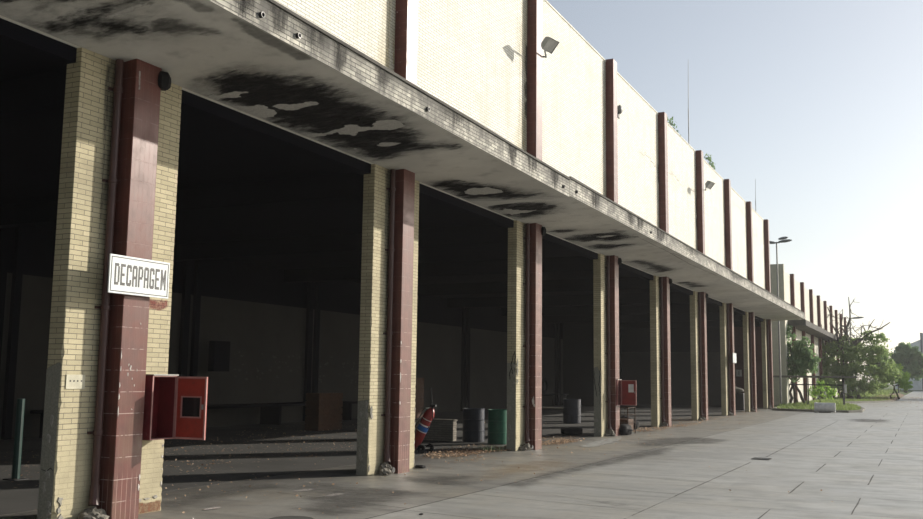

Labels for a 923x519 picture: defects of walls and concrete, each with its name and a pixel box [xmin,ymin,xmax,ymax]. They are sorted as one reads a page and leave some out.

leakage [47,0,145,34]
leakage [208,71,460,172]
leakage [432,180,556,219]
leakage [552,230,631,262]